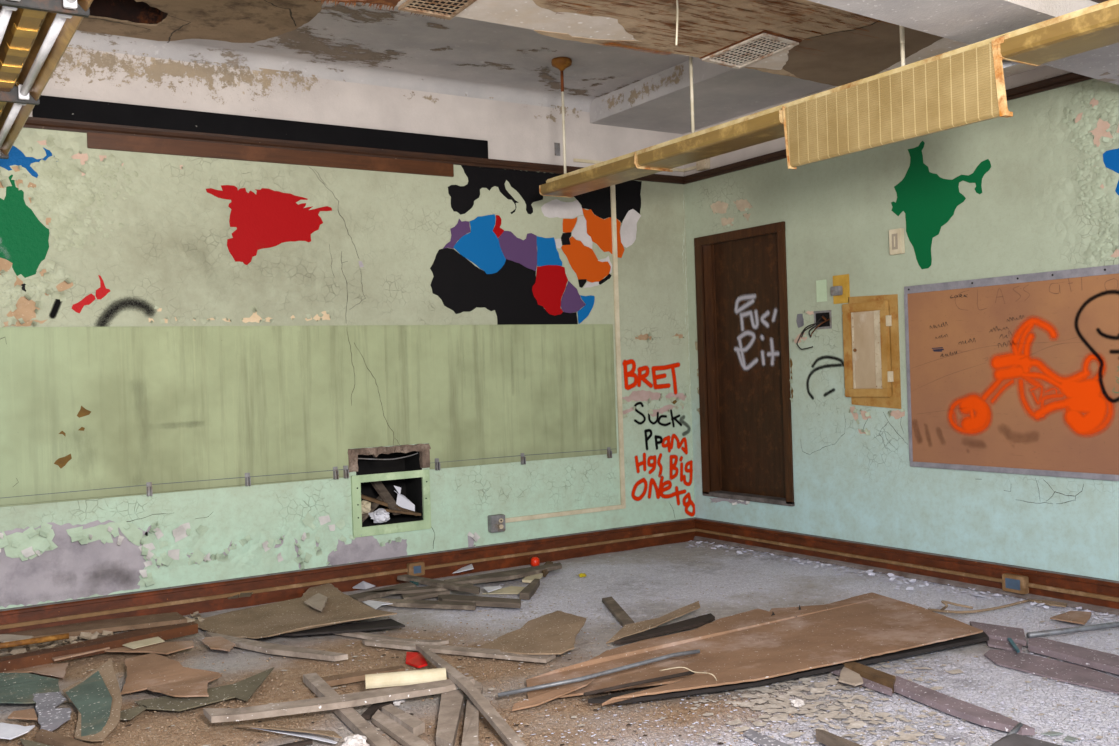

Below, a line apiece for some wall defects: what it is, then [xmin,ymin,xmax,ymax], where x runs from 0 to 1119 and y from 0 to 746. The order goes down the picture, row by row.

peeling [50,0,412,109]
peeling [517,0,944,122]
peeling [1072,98,1119,149]
peeling [0,165,36,203]
peeling [0,258,75,328]
crack [309,167,401,446]
peeling [77,406,91,431]
peeling [54,454,72,468]
peeling [0,512,407,608]